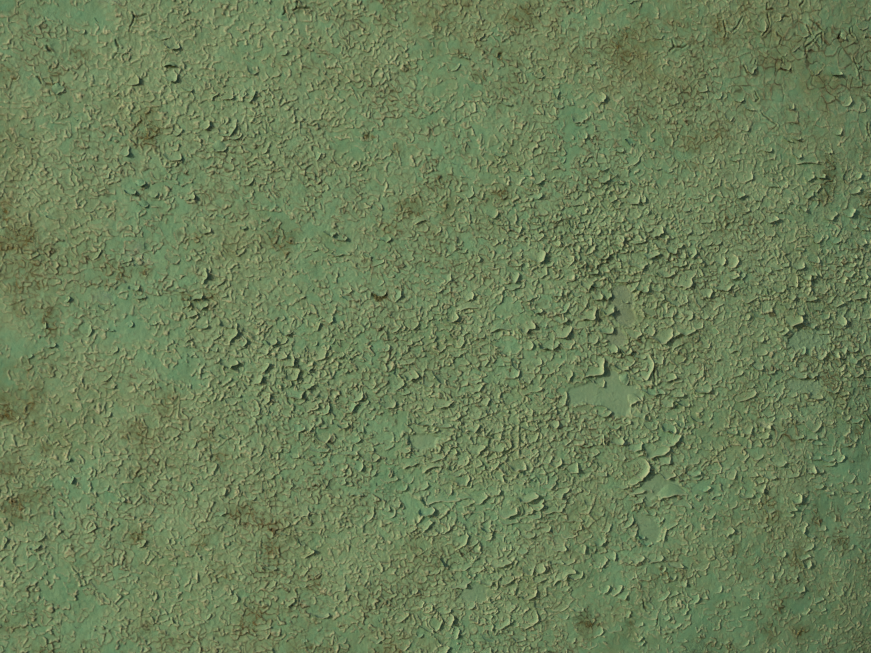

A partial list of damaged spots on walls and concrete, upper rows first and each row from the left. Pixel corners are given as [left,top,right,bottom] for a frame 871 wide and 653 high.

peeling [173,268,226,357]
peeling [210,135,871,653]